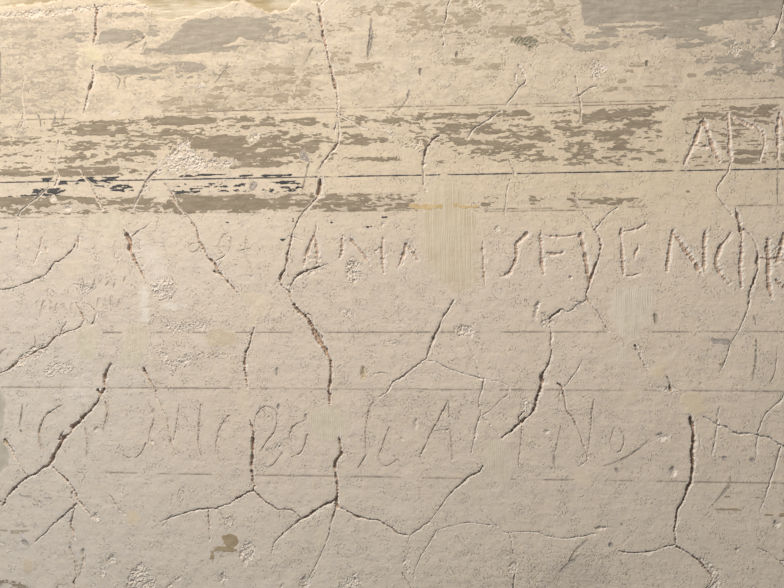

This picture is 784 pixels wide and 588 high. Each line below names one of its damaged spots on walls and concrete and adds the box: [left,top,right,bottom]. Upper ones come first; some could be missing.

crack [0,301,99,375]
crack [0,139,104,291]
crack [0,362,113,588]
crack [82,65,97,117]
crack [91,3,106,43]
crack [122,221,153,285]
crack [132,169,239,295]
crack [277,0,369,409]
peeling [0,0,784,228]
crack [159,194,675,588]
crack [618,392,784,588]
crack [715,162,764,374]